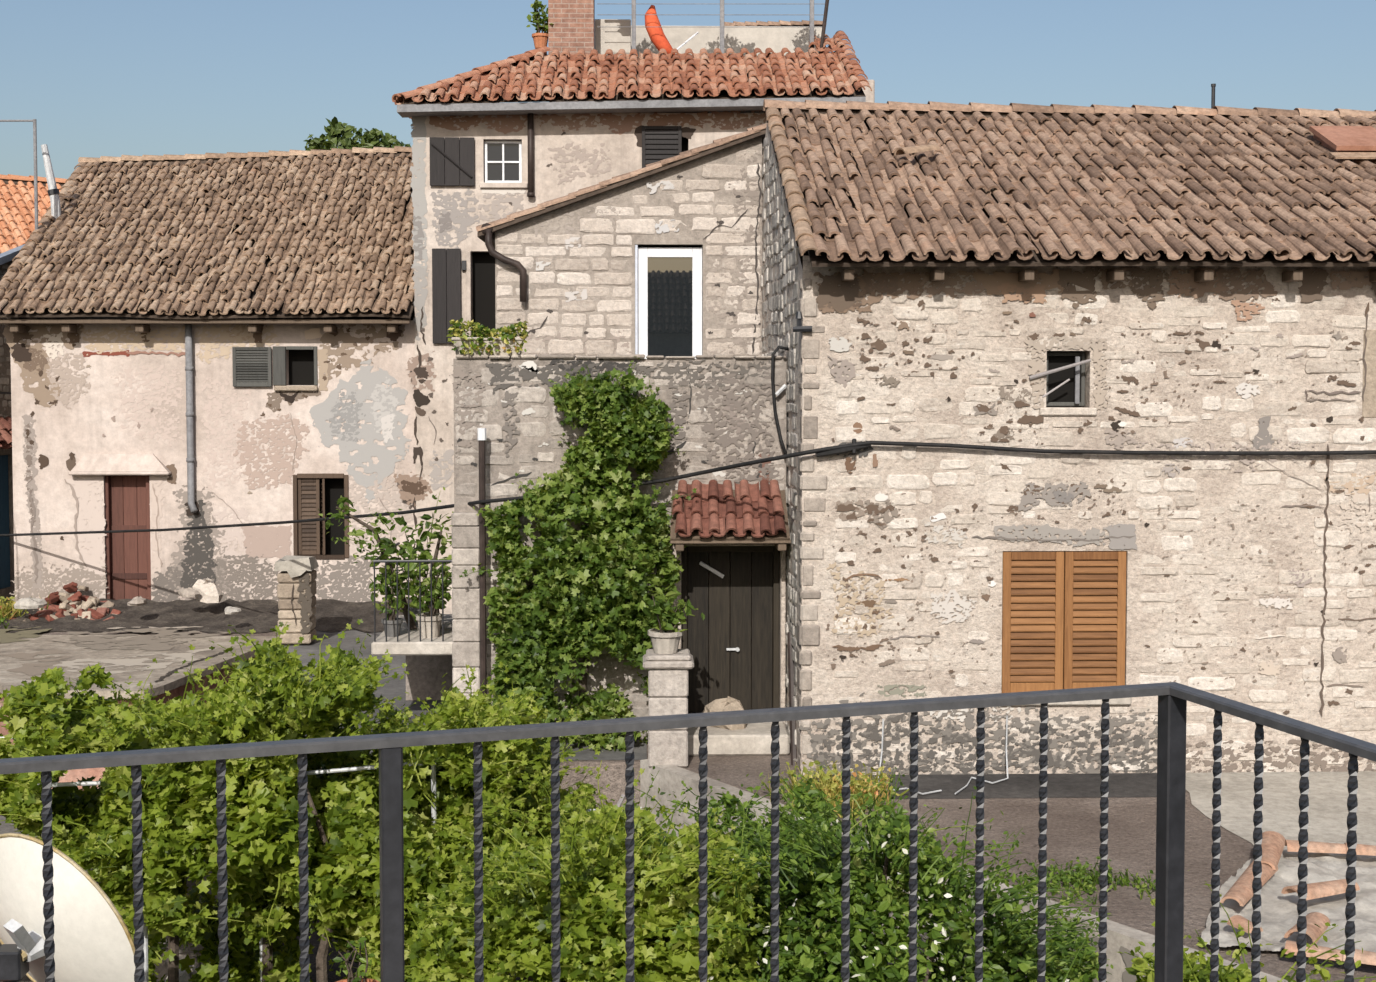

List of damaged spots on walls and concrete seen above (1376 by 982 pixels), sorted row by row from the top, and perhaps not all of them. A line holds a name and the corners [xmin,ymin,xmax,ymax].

flaking render [2,318,130,591]
leakage [151,485,282,603]
flaking render [401,357,462,495]
crack [1234,440,1376,716]